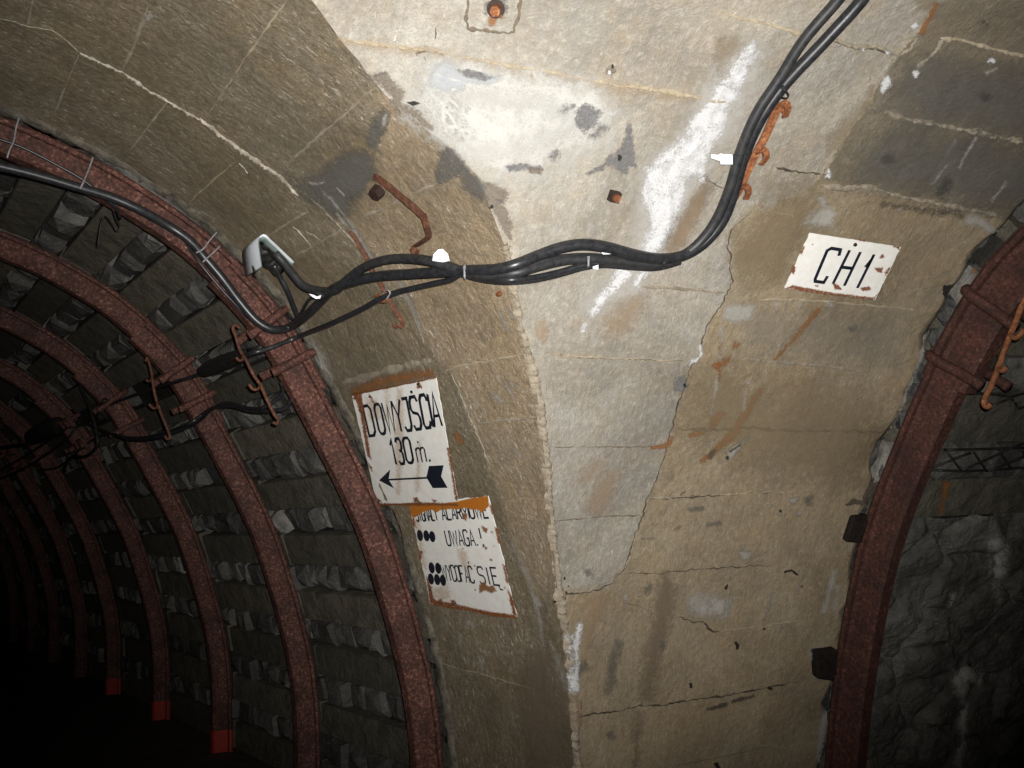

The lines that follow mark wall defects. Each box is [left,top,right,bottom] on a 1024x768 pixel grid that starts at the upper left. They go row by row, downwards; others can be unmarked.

leakage [398,53,623,184]
rust [350,369,434,394]
crack [547,210,882,611]
rust [689,388,762,462]